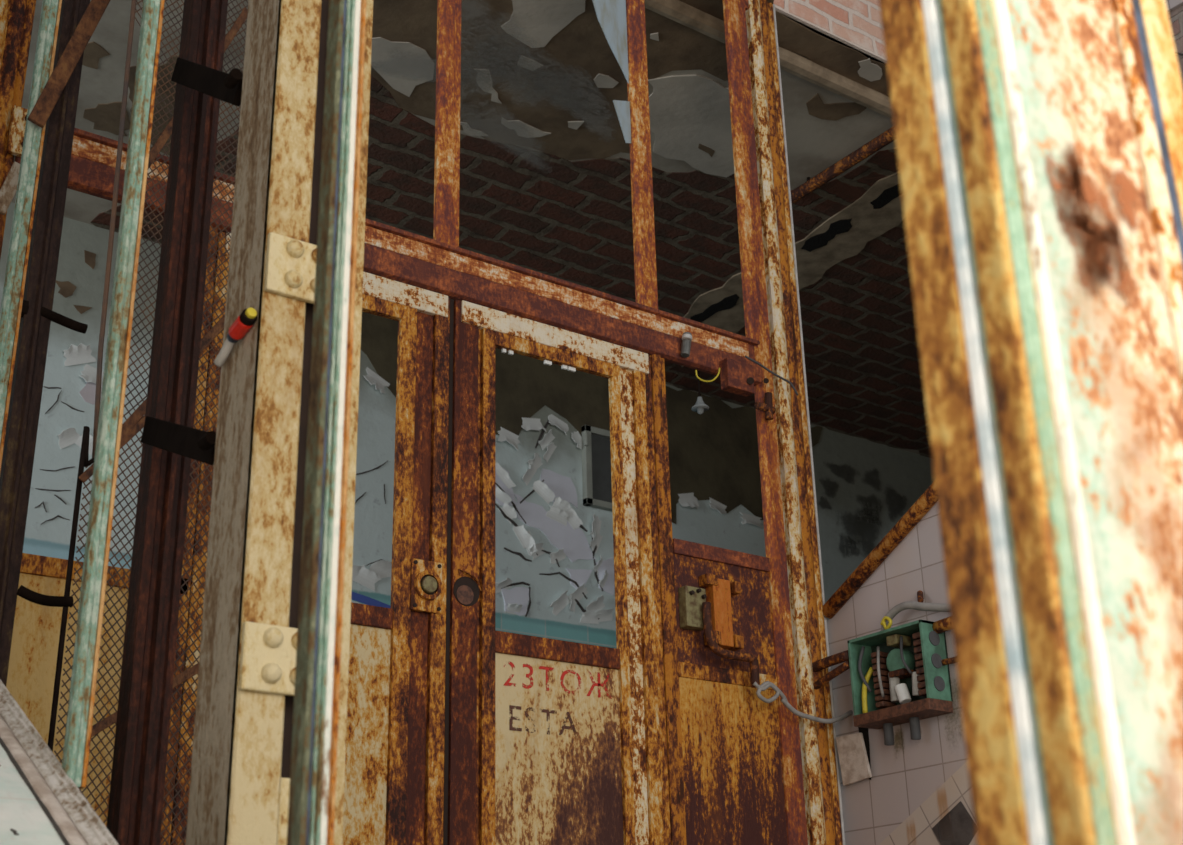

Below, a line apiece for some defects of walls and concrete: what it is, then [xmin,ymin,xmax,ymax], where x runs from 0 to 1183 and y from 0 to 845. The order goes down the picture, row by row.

flaking render [90,205,122,233]
flaking render [83,66,136,136]
flaking render [150,55,179,155]
peeling [361,312,398,397]
flaking render [365,0,437,239]
flaking render [459,0,636,302]
flaking render [645,8,746,337]
flaking render [680,0,724,21]
flaking render [767,0,890,97]
flaking render [791,148,932,458]
corrosion [1047,145,1139,307]
peeling [664,361,763,528]